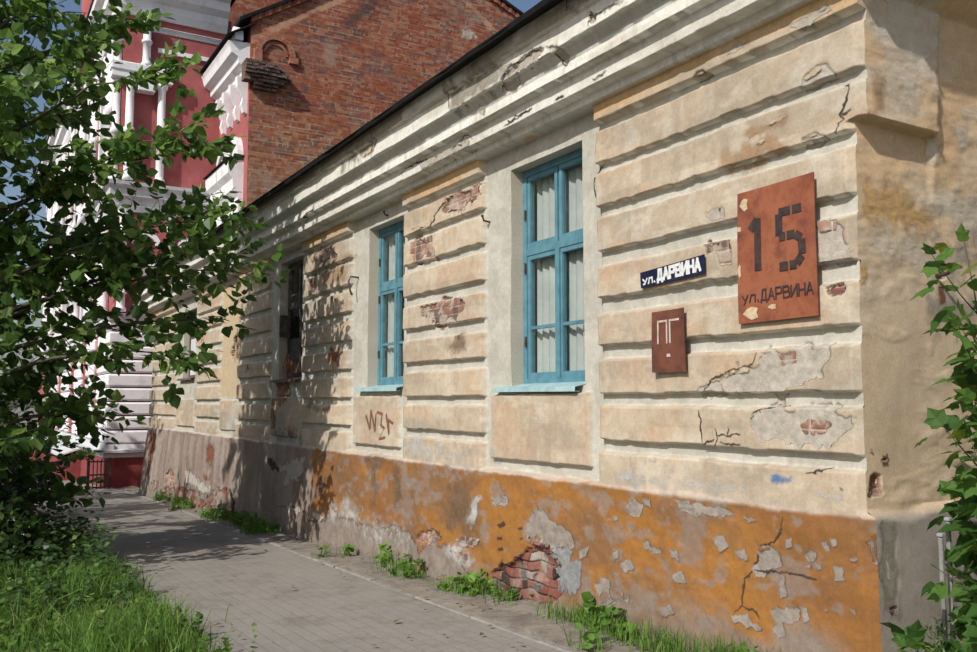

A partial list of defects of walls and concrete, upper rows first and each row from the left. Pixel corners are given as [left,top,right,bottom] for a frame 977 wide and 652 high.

crack [834,84,851,134]
flaking render [411,183,481,266]
flaking render [420,296,465,330]
spalling [697,342,855,450]
crack [698,404,791,446]
spalling [151,468,234,511]
peeling [613,498,651,521]
peeling [674,499,758,523]
flaking render [492,506,589,604]
peeling [643,540,686,583]
peeling [713,535,809,638]
crack [736,517,817,618]